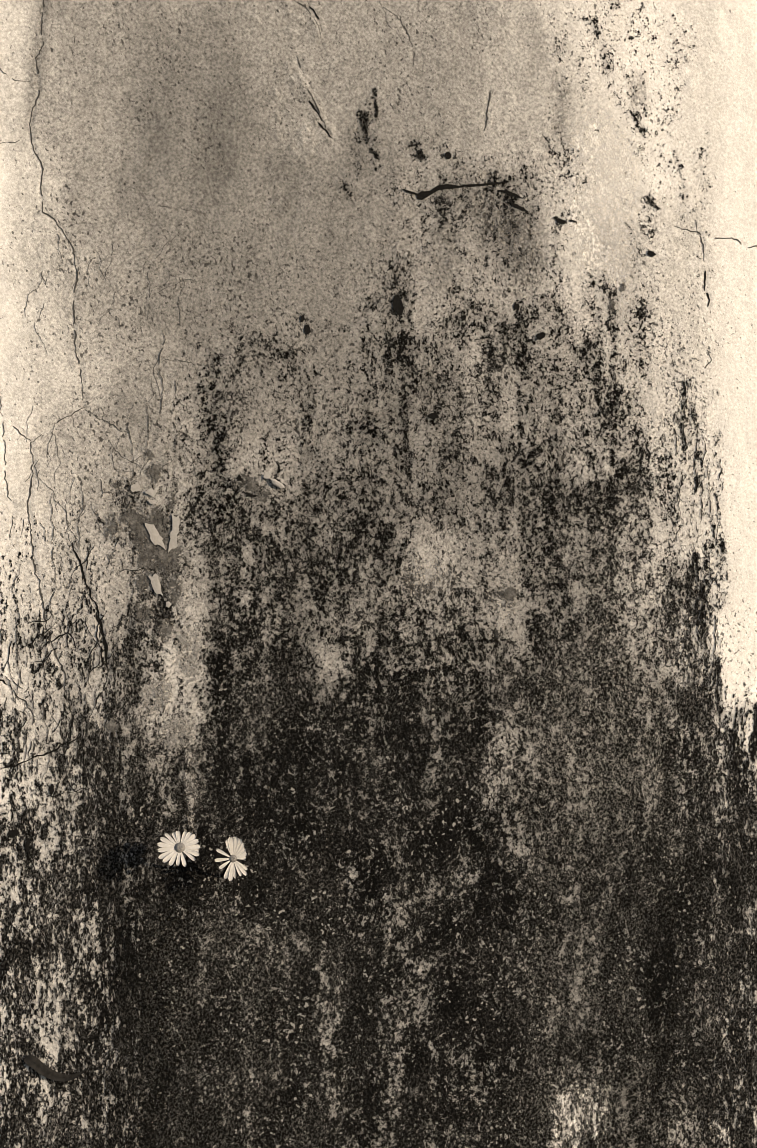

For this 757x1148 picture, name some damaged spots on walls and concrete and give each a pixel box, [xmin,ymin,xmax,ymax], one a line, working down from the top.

crack [281,0,323,44]
crack [297,57,332,138]
damp [369,139,432,209]
crack [674,220,757,307]
crack [0,0,198,851]
peeling [104,447,202,684]
peeling [141,676,199,833]